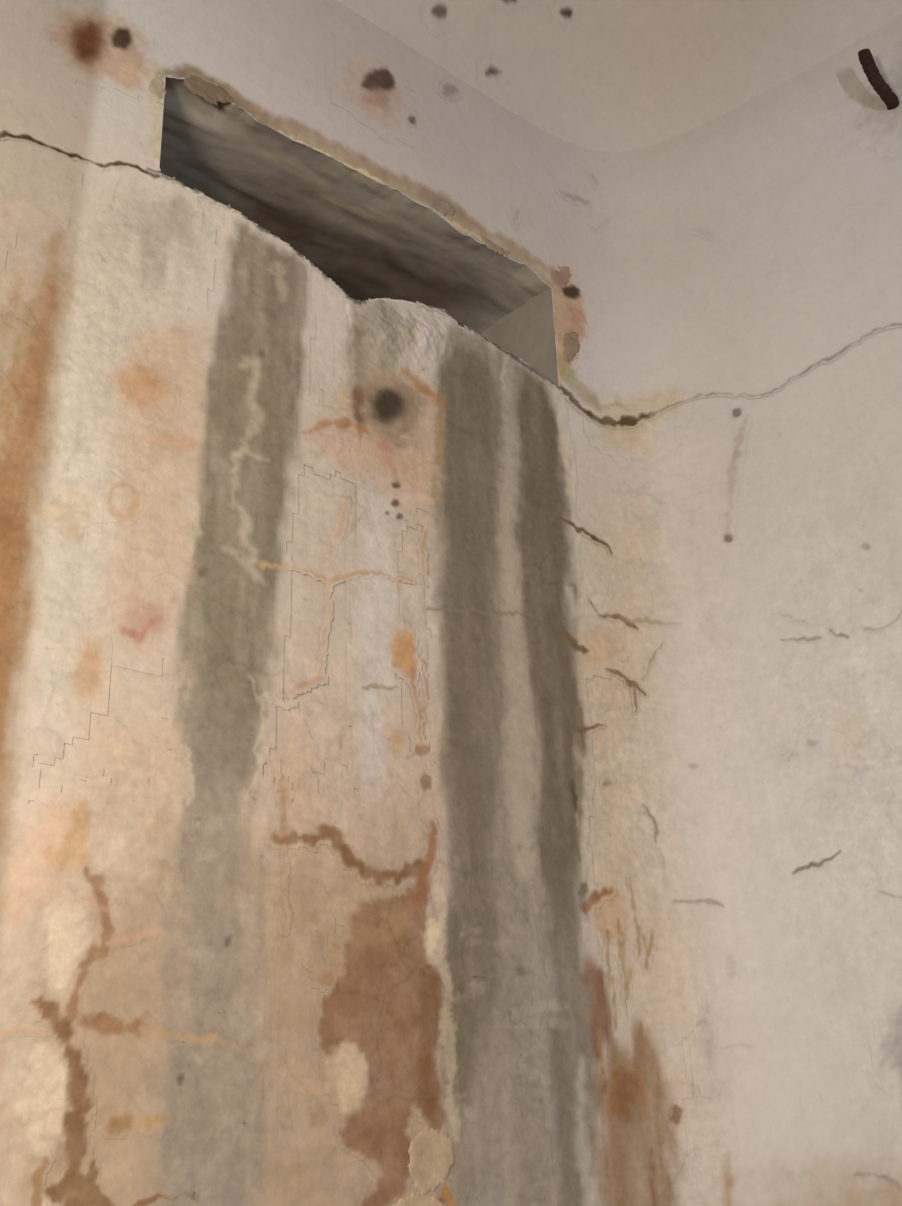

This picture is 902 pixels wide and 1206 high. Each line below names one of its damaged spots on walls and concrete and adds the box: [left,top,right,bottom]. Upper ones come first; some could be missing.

rust [29,0,171,100]
spalling [549,0,580,29]
crack [0,128,368,307]
spalling [139,59,608,416]
flaking render [179,350,272,591]
crack [416,301,902,468]
leakage [0,157,611,1206]
flaking render [178,742,199,808]
flaking render [242,672,464,1206]
rust [577,872,698,1206]
rust [712,1146,745,1206]